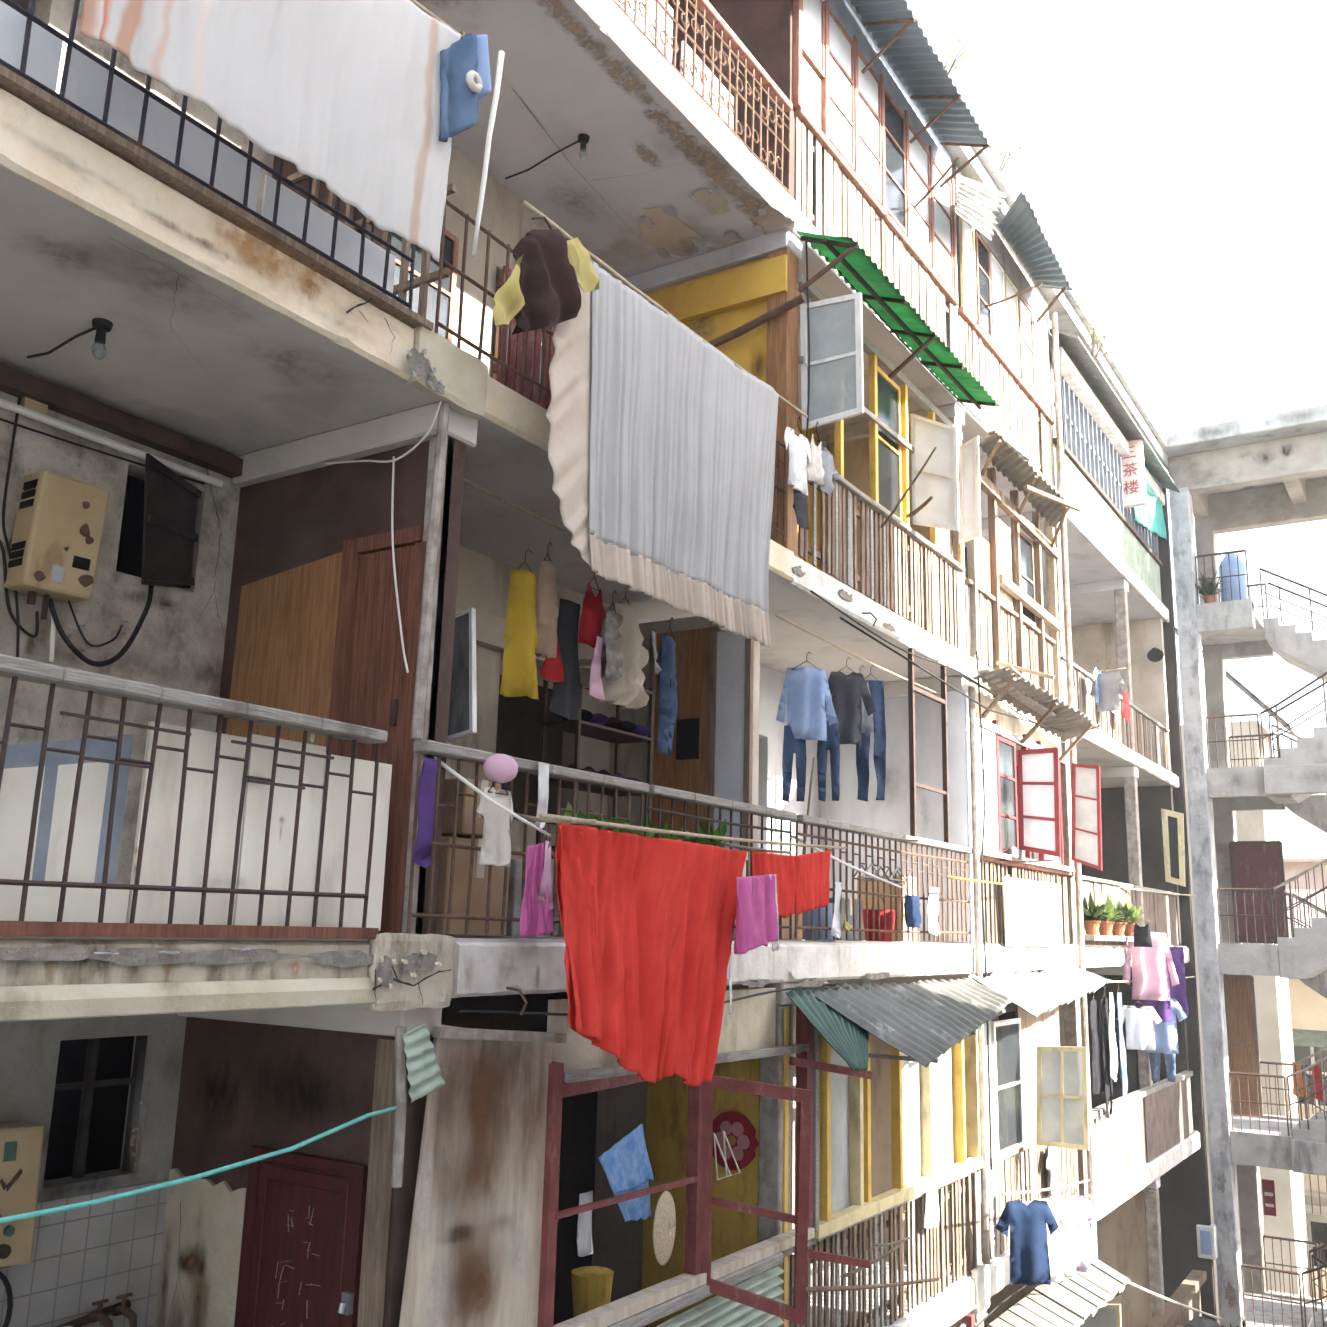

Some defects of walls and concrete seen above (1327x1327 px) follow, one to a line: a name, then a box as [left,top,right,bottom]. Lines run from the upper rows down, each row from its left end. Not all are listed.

peeling [539,0,795,258]
spalling [406,347,445,395]
spalling [0,945,442,989]
water stain [462,1254,490,1310]